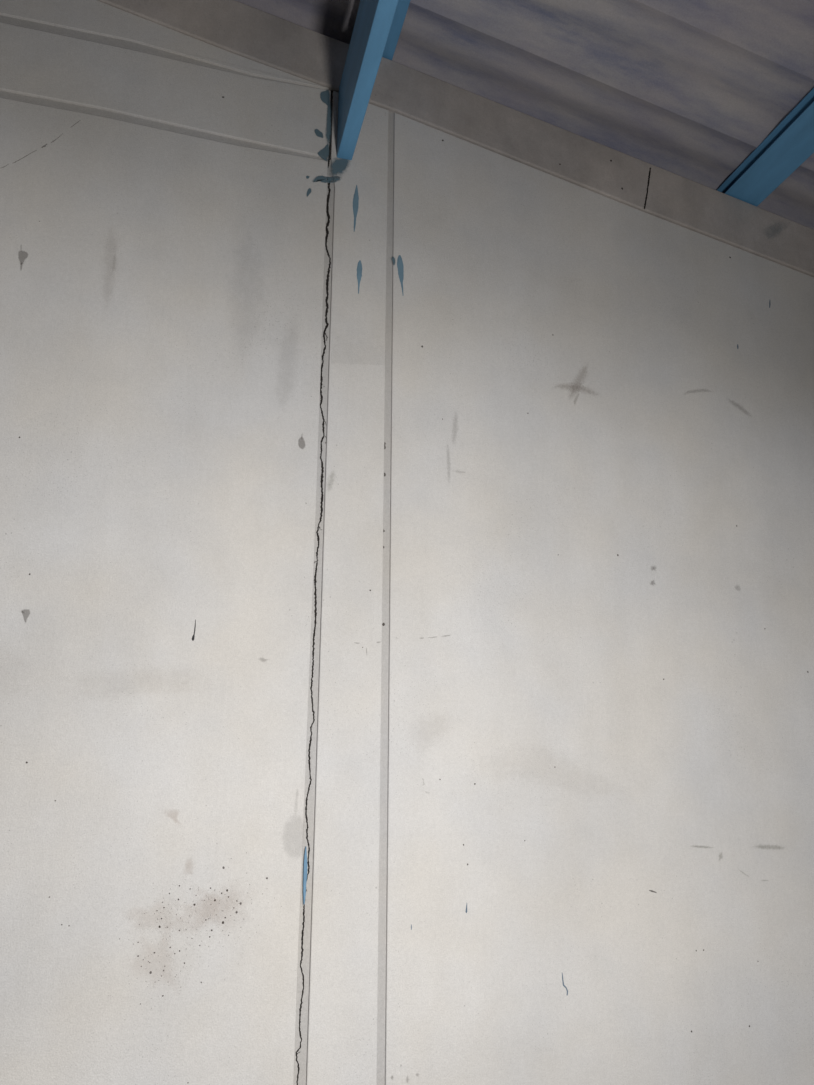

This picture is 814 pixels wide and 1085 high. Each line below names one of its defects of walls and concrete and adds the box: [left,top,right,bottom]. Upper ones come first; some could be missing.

crack [296,90,333,1085]